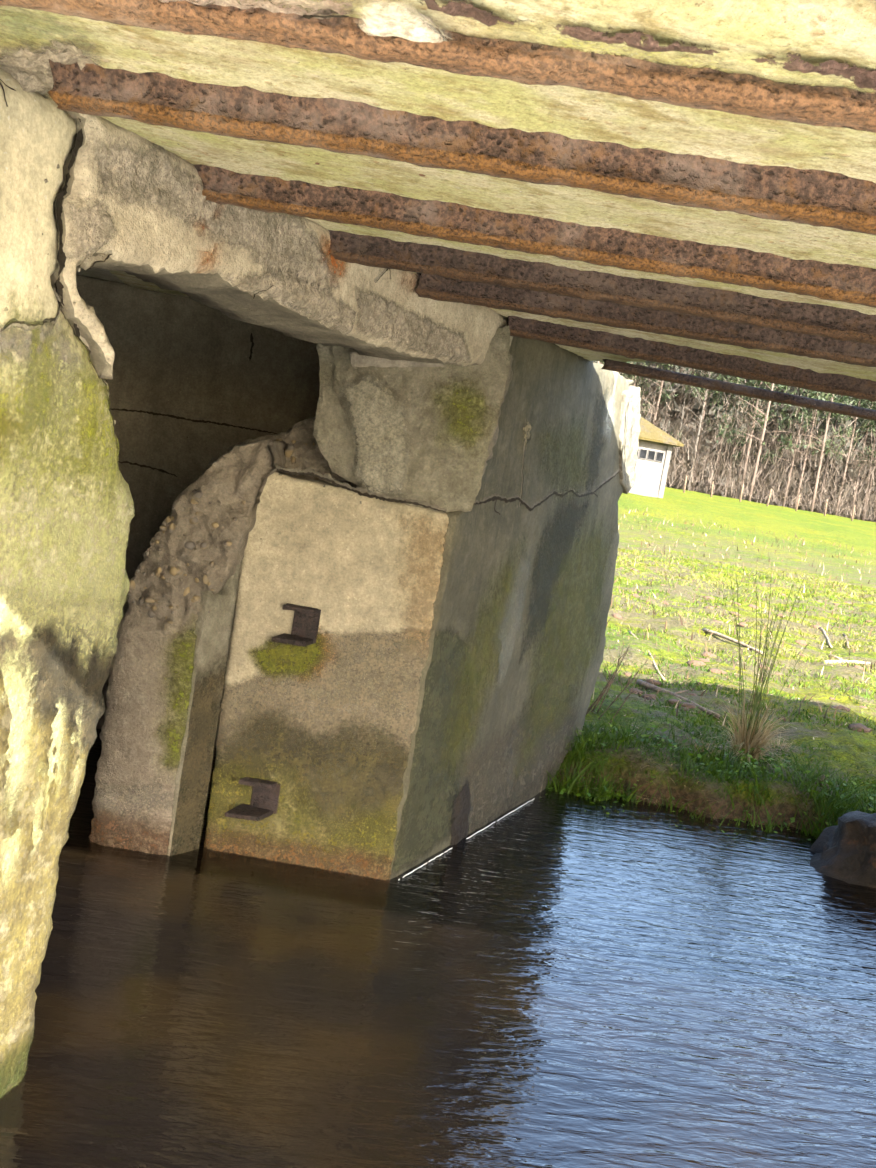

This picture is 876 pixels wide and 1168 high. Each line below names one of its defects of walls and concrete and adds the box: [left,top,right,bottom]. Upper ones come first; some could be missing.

spalling [0,30,109,99]
spalling [159,0,721,55]
spalling [745,52,876,91]
crack [0,119,277,477]
spalling [70,141,470,363]
crack [275,464,447,512]
crack [474,403,632,515]
damp [499,390,614,669]
damp [0,590,577,1098]